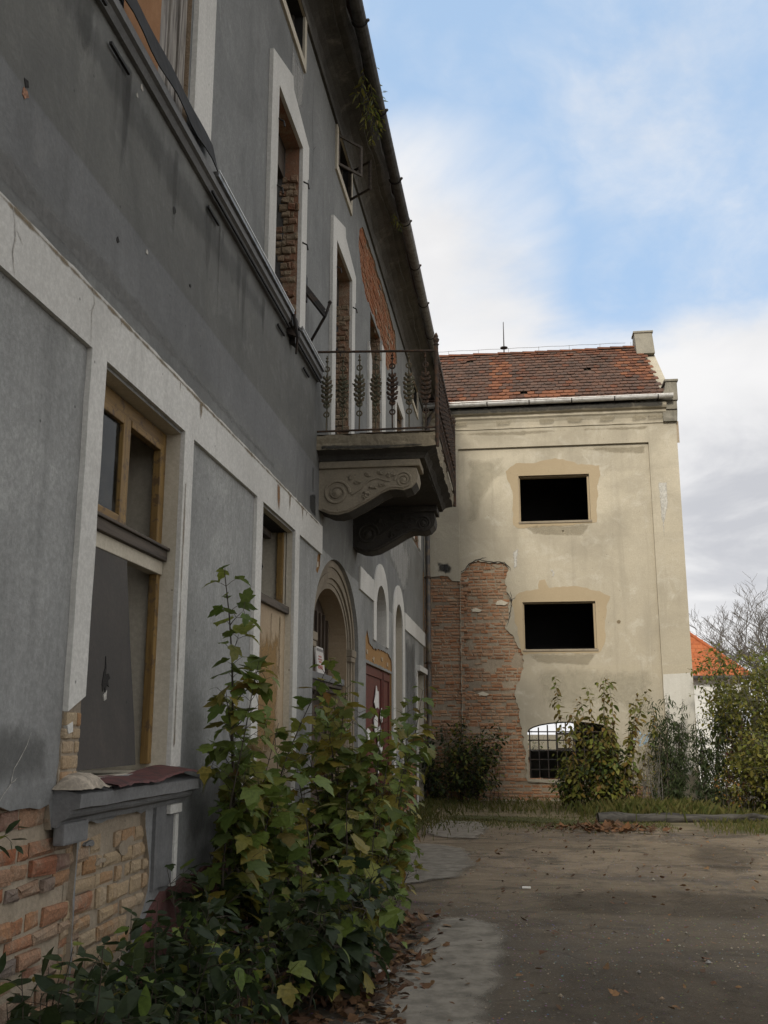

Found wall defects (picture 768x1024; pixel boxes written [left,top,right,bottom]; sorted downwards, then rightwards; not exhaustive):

flaking render [359,228,396,370]
flaking render [56,701,81,784]
flaking render [399,561,607,811]
flaking render [52,813,148,1013]